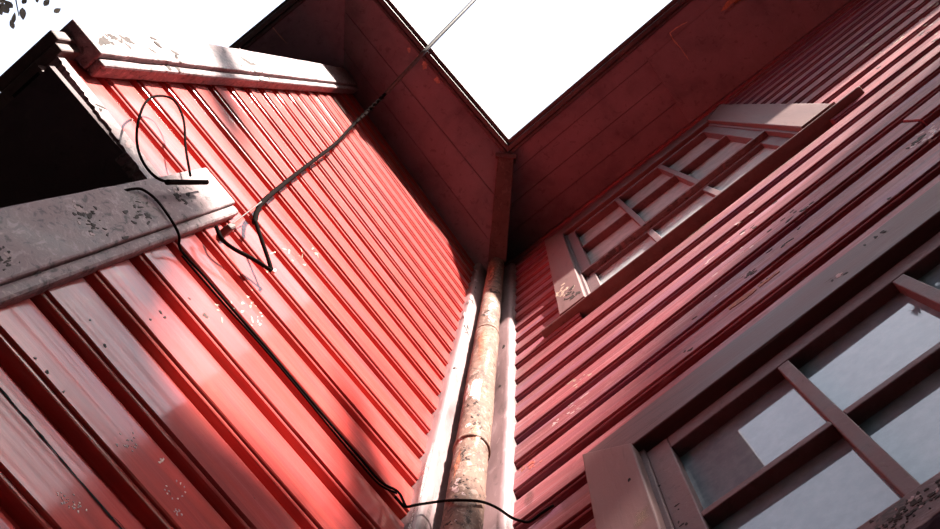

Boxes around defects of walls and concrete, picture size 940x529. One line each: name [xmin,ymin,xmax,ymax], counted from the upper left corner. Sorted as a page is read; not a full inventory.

peeling [89,28,135,56]
peeling [148,36,185,73]
peeling [240,49,271,81]
peeling [72,200,109,236]
peeling [122,201,152,225]
peeling [167,187,190,205]
peeling [463,269,501,335]
peeling [458,379,482,461]
peeling [869,479,940,529]